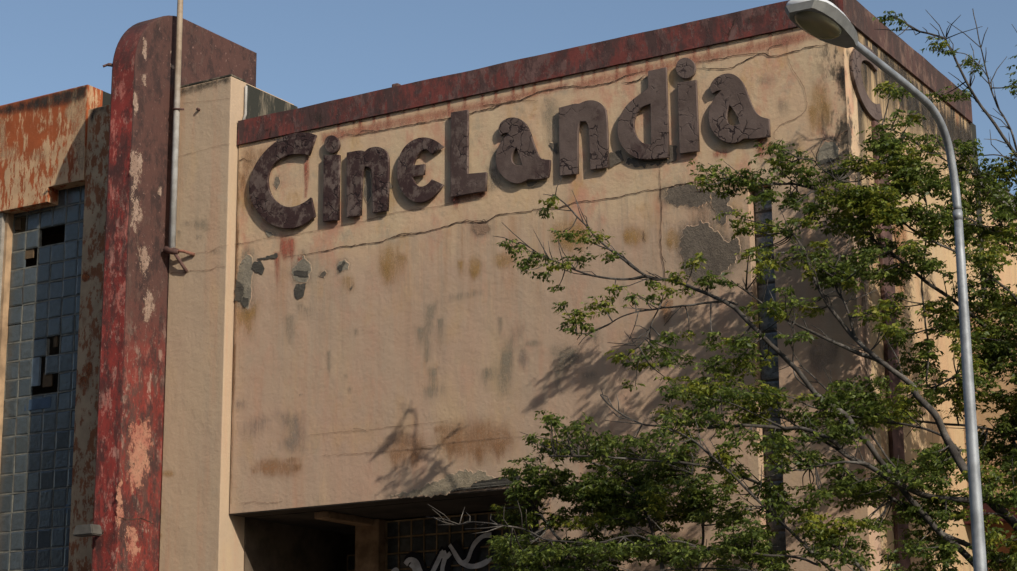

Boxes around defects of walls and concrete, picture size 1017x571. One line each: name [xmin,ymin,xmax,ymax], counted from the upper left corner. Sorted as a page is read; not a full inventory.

crack [339,71,646,138]
crack [696,18,827,142]
peeling [129,148,143,233]
peeling [135,246,152,276]
peeling [142,290,155,323]
peeling [234,251,278,310]
peeling [291,254,350,299]
crack [169,163,713,286]
peeling [664,182,742,282]
peeling [116,417,153,563]
peeling [390,468,520,498]